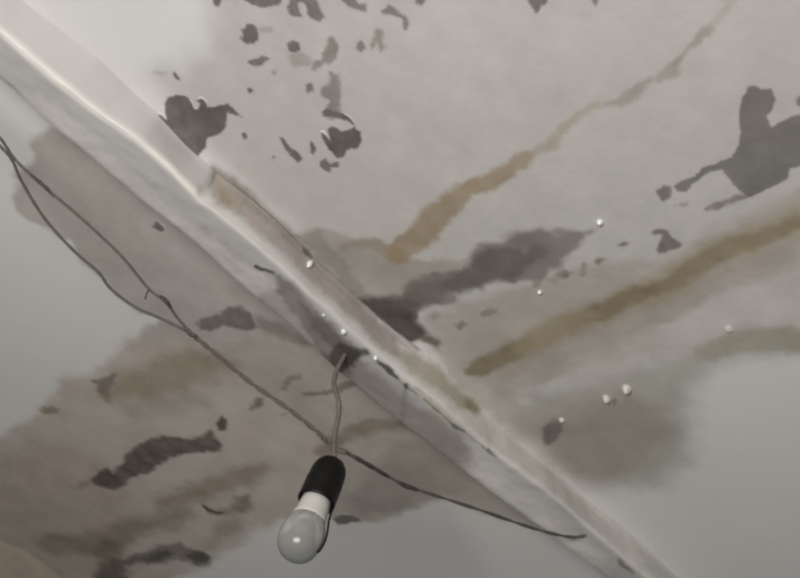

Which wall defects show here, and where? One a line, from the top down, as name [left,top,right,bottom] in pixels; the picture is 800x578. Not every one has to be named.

peeling [242,24,257,43]
peeling [247,0,322,21]
peeling [158,95,243,155]
water stain [187,69,227,108]
peeling [320,88,361,171]
water stain [713,143,736,171]
peeling [657,86,800,200]
water stain [766,89,800,127]
water stain [212,0,718,567]
water stain [0,129,563,578]
water stain [508,326,800,482]
peeling [92,418,226,488]